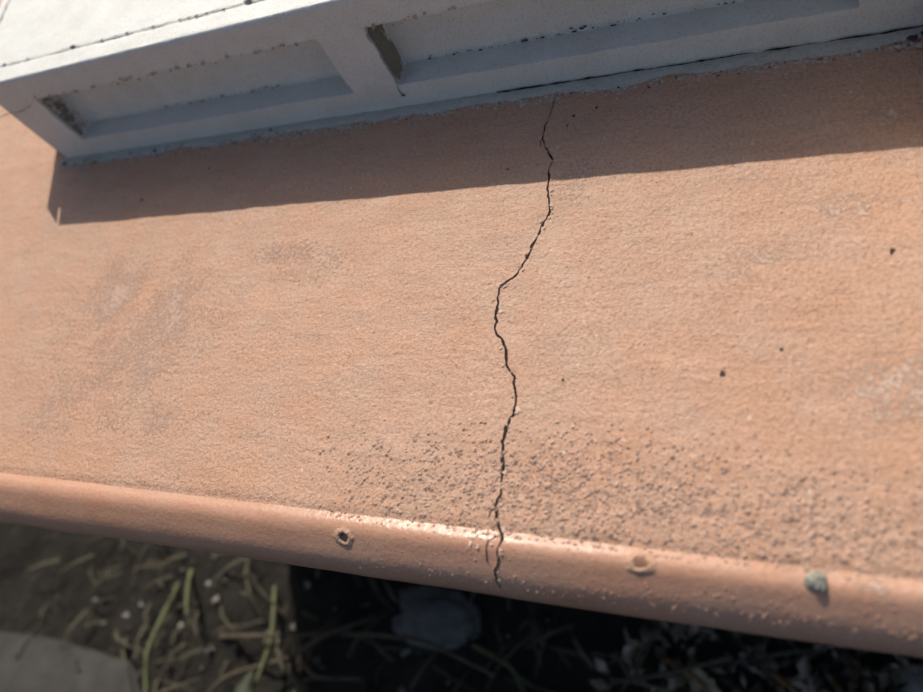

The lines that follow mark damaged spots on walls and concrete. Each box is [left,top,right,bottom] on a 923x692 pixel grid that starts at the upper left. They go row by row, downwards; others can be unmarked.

crack [485,98,555,588]